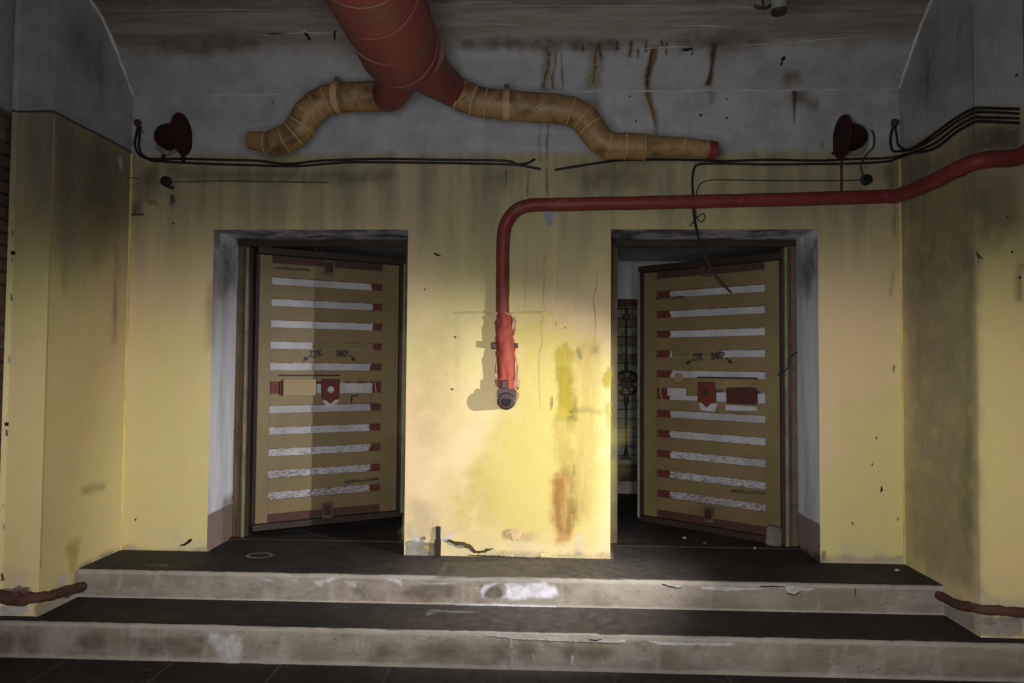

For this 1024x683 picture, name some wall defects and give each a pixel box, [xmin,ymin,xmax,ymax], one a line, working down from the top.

corrosion [616,41,667,127]
corrosion [705,43,717,85]
damp [495,330,590,555]
corrosion [553,470,575,540]
crack [444,539,541,558]